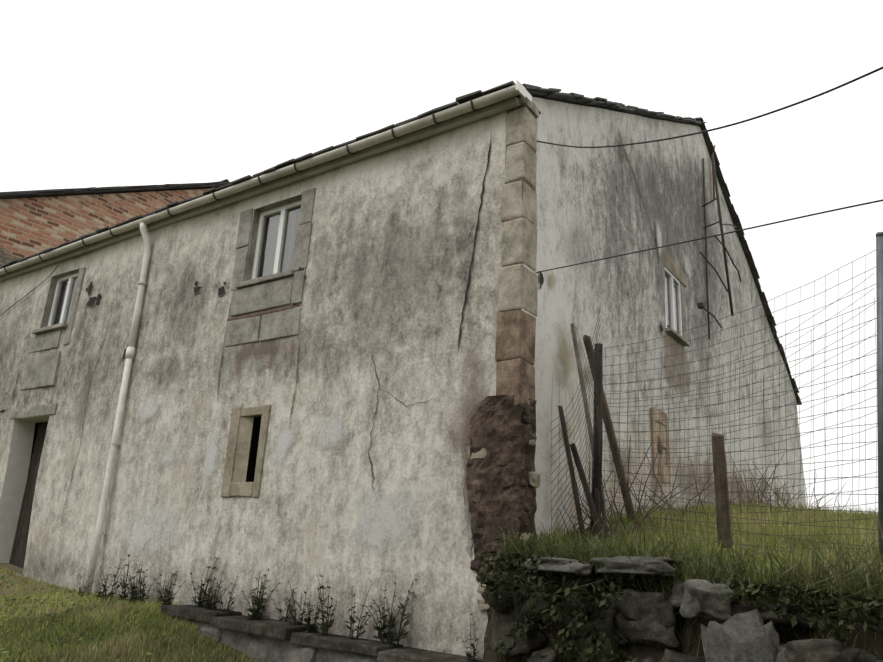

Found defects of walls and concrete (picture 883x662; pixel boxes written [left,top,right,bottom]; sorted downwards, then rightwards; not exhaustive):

crack [457,139,491,356]
crack [368,347,431,491]